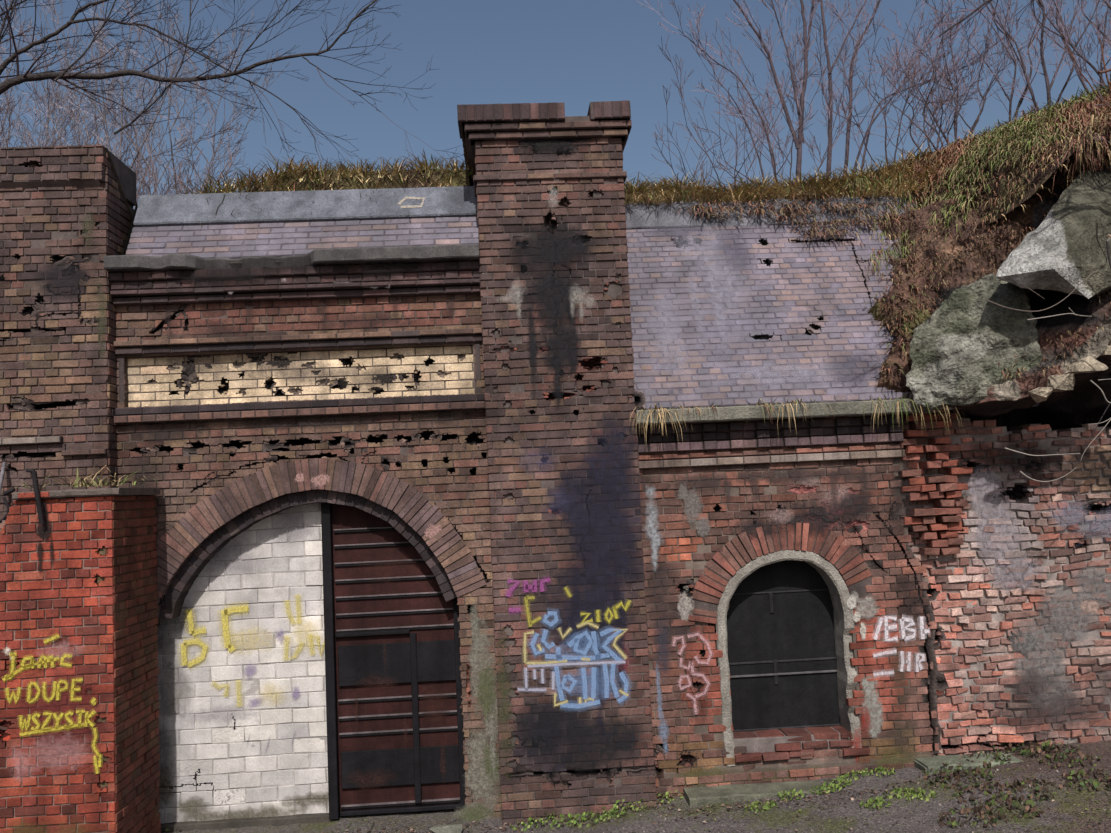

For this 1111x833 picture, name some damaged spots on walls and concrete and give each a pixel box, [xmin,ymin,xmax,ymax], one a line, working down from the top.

spalling [281,359,368,396]
spalling [432,354,466,381]
water stain [529,312,537,376]
water stain [571,573,583,654]
water stain [614,602,625,684]
crack [848,498,949,751]
water stain [595,650,603,725]